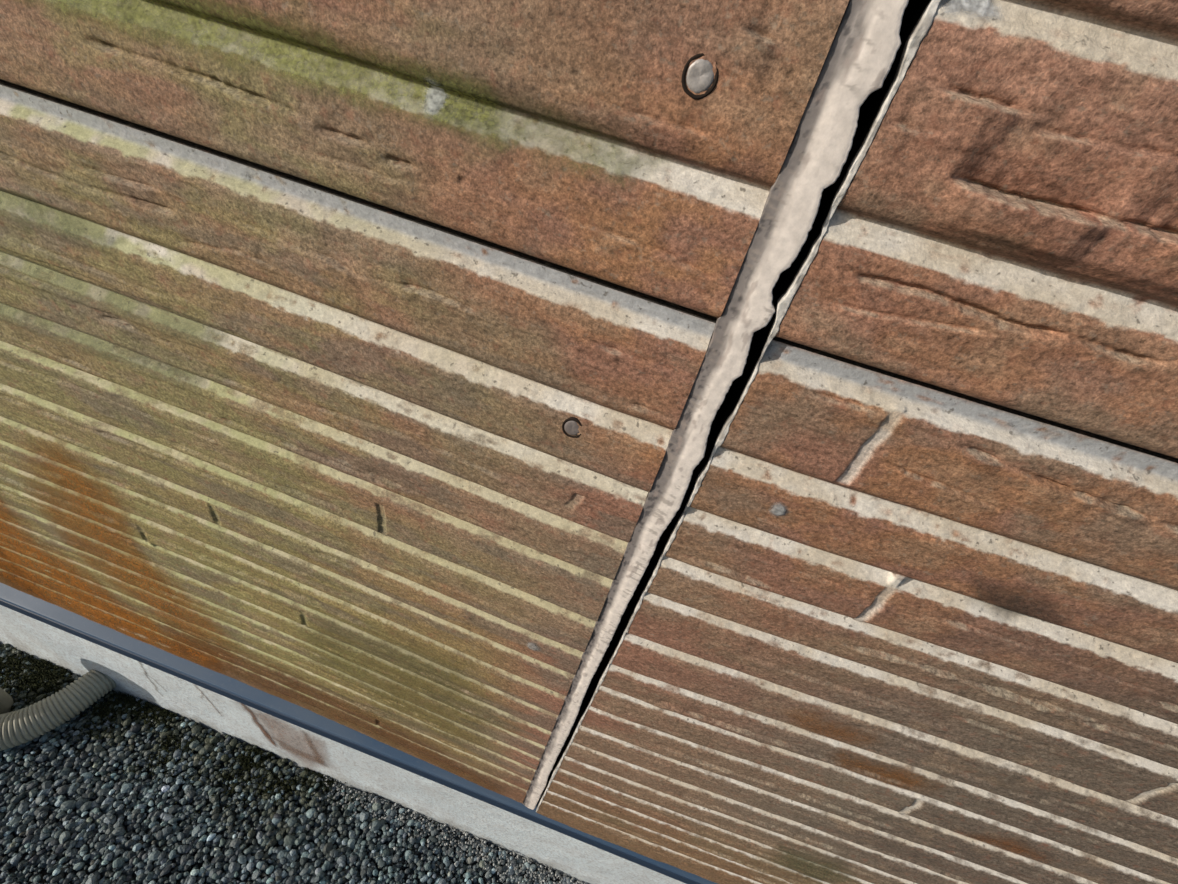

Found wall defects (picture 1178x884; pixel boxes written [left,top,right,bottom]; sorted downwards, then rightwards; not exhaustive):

rust [0,457,234,664]
crack [536,0,941,812]